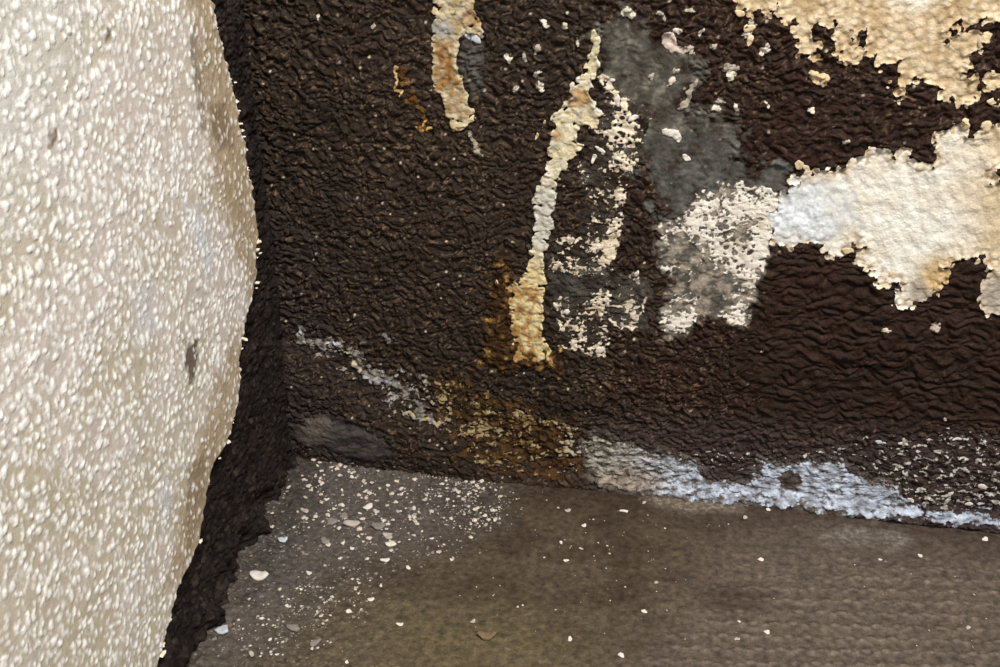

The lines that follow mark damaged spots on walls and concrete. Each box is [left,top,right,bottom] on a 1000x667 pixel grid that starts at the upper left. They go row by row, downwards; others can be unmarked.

corrosion [393,66,433,134]
spalling [504,44,541,64]
leakage [478,4,793,380]
peeling [548,0,1000,357]
corrosion [424,367,595,486]
leakage [578,428,1000,550]